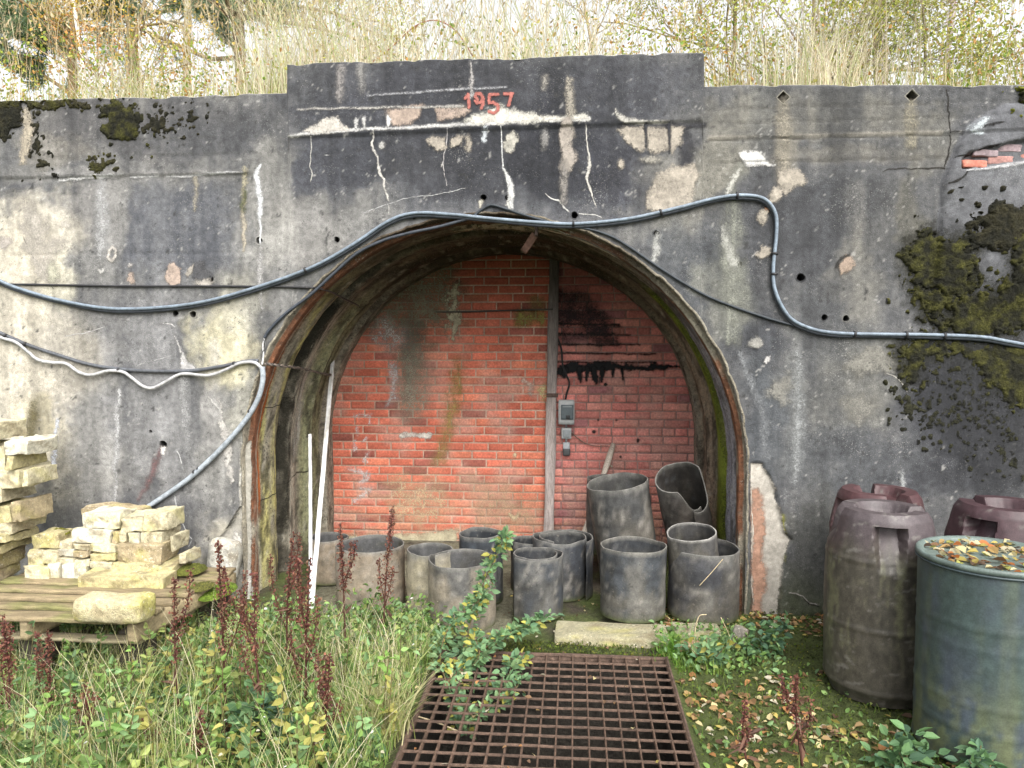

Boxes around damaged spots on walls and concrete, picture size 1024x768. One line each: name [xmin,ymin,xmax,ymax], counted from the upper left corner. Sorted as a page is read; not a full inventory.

water stain [19,108,35,165]
crack [364,128,464,214]
peeling [388,104,469,126]
crack [500,126,515,208]
crack [546,125,602,218]
peeling [619,122,699,211]
peeling [739,151,806,224]
crack [884,89,1004,184]
water stain [888,221,1023,385]
water stain [557,322,680,376]
corrosion [137,446,166,500]
spalling [750,463,790,614]